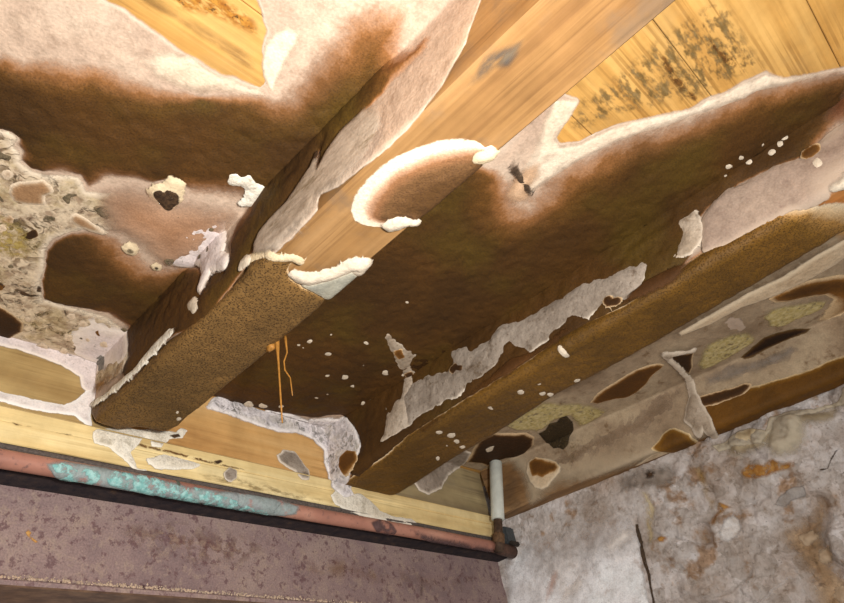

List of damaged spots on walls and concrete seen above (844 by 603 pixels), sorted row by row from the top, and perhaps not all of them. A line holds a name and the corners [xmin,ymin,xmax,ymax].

water stain [177,0,254,29]
water stain [593,14,738,118]
water stain [253,107,380,252]
spalling [20,229,38,240]
spalling [602,295,623,312]
water stain [798,409,836,422]
water stain [539,416,574,449]